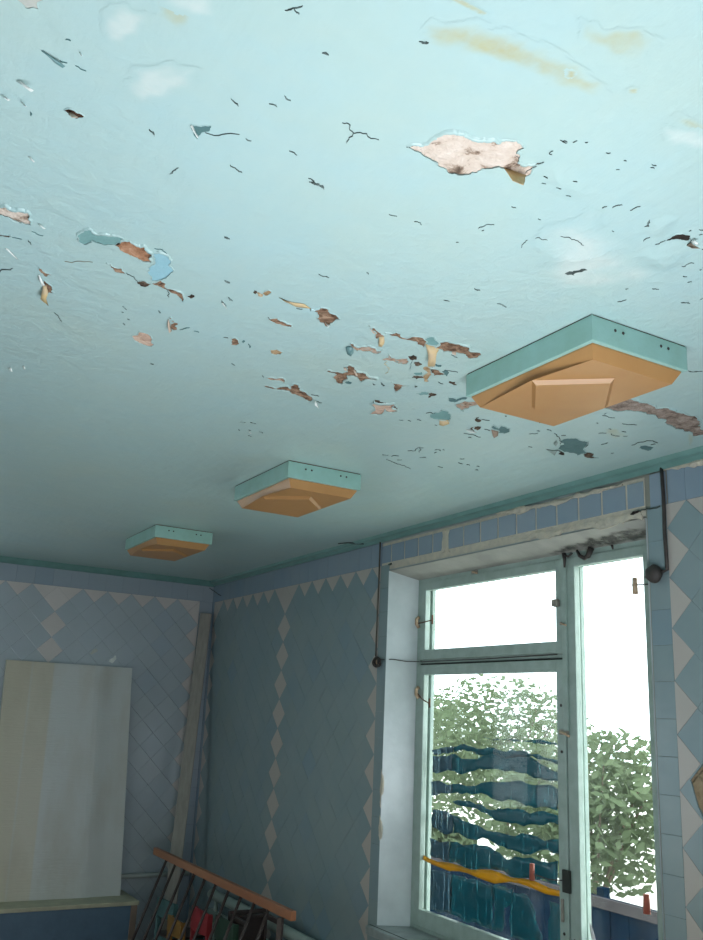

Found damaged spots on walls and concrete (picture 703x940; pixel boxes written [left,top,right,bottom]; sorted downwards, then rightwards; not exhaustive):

crack [342,122,379,144]
peeling [406,129,571,197]
peeling [0,204,45,259]
peeling [76,228,194,302]
peeling [253,289,340,328]
peeling [262,375,322,409]
peeling [325,326,510,438]
peeling [531,398,703,458]